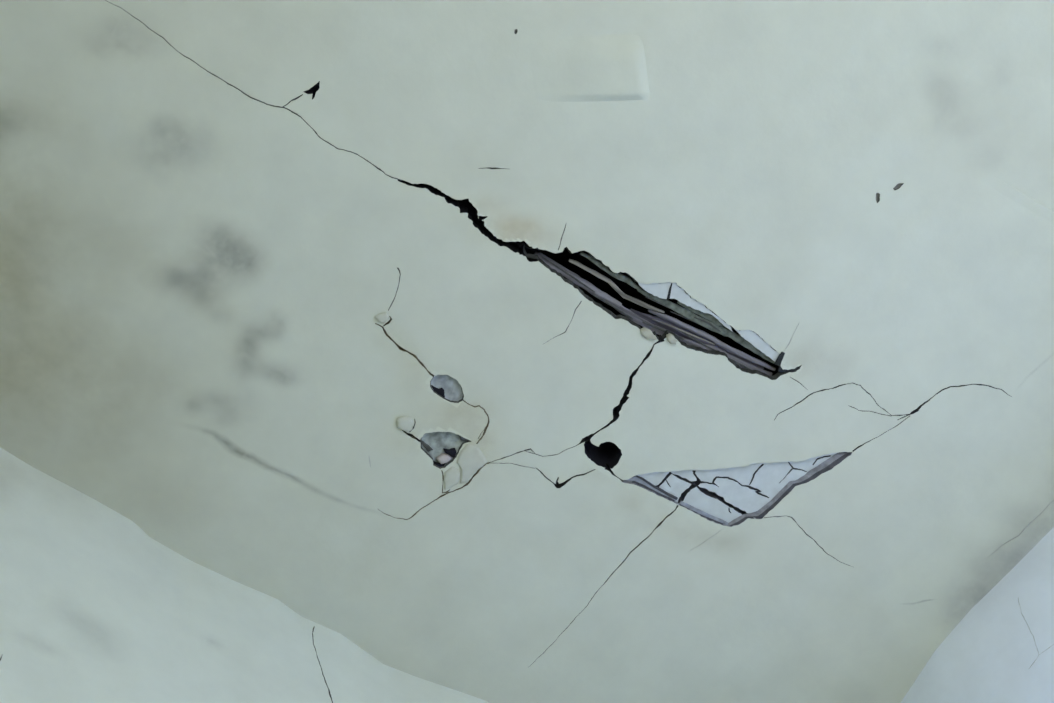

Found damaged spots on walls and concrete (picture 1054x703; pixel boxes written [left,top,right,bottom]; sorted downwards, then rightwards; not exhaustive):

crack [106,0,566,262]
crack [375,268,433,376]
spalling [420,432,472,469]
spalling [430,375,464,403]
crack [378,335,665,520]
crack [774,377,1012,452]
spalling [728,452,852,527]
crack [764,516,850,566]
crack [530,505,678,666]
crack [312,628,333,703]